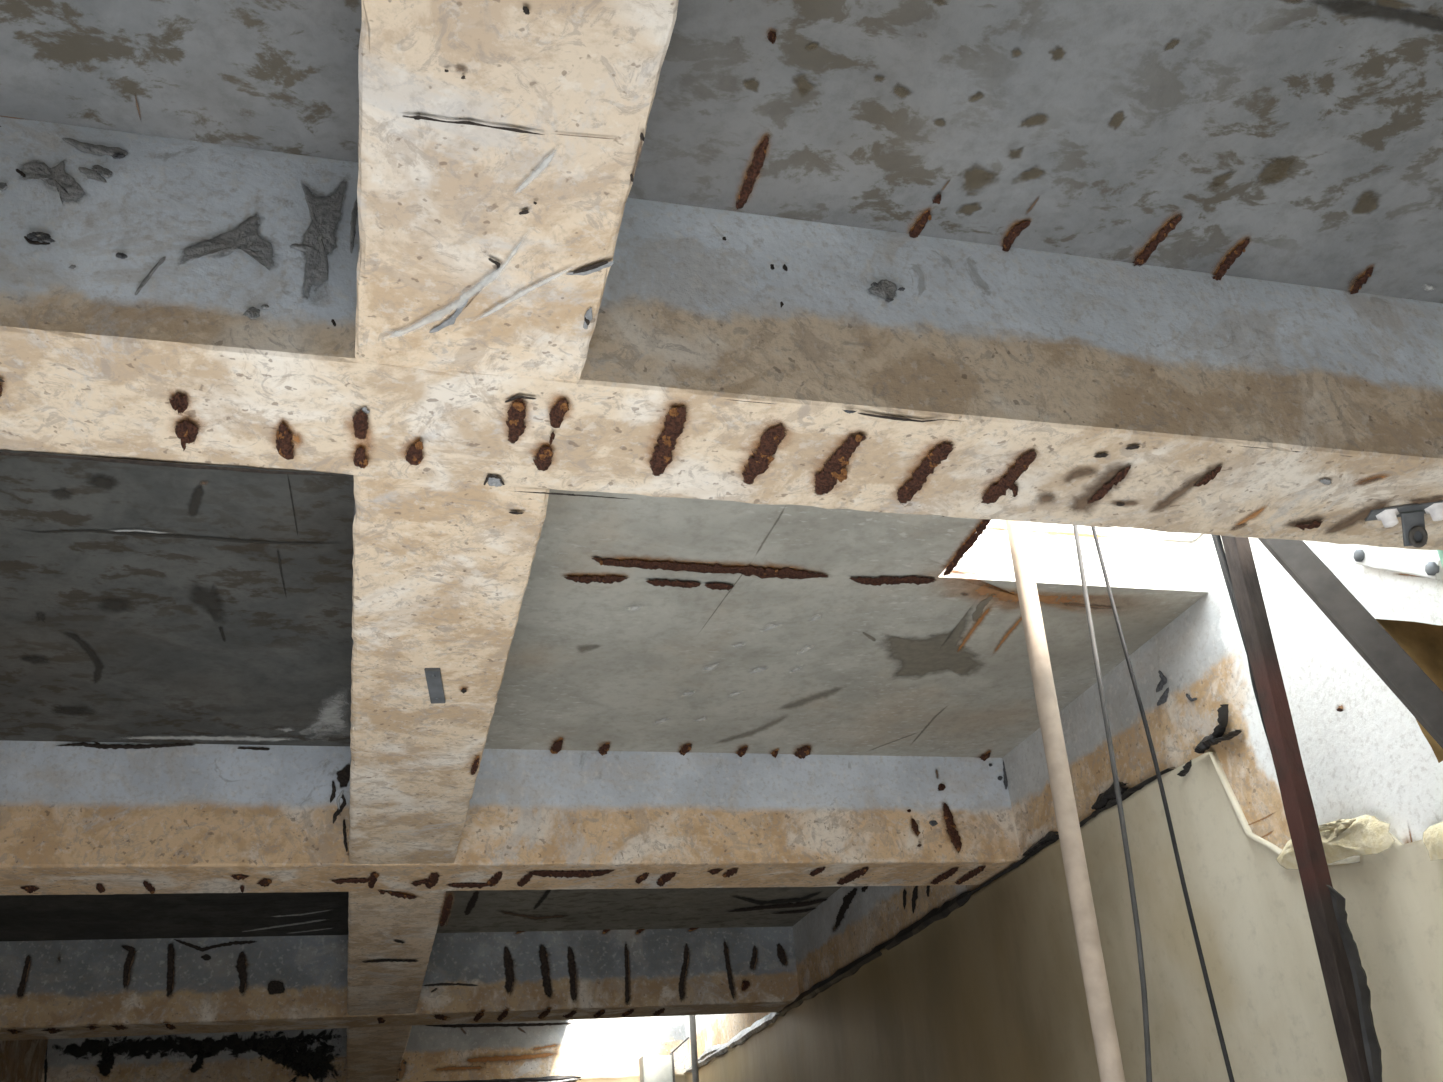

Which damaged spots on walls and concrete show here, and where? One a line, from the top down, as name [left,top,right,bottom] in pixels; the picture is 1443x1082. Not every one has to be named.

crack [403,115,612,139]
peeling [0,138,128,202]
peeling [24,232,55,245]
peeling [135,214,275,295]
peeling [290,180,358,299]
crack [429,258,500,333]
crack [567,261,614,276]
corrosion [649,406,687,476]
corrosion [742,424,785,485]
corrosion [815,434,866,495]
corrosion [564,557,828,591]
corrosion [850,443,1037,652]